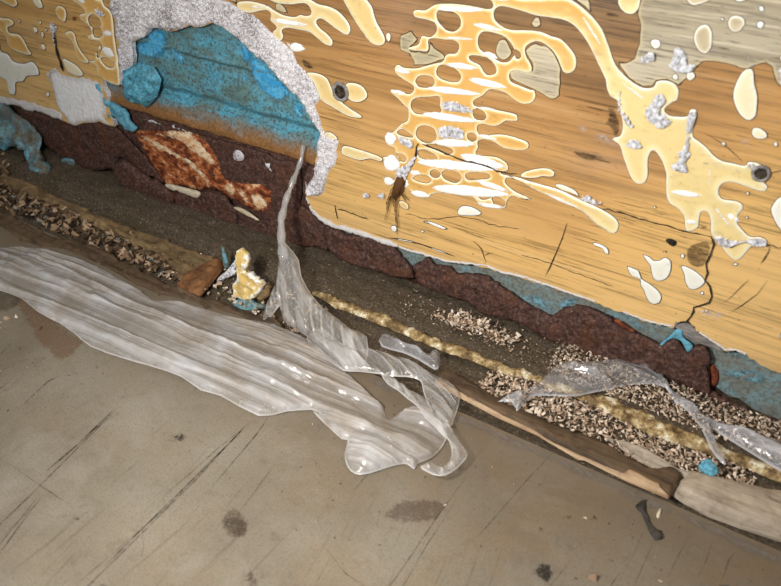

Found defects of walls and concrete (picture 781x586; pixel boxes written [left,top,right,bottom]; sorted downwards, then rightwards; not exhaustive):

peeling [0,103,51,174]
spalling [50,0,339,196]
peeling [400,30,445,65]
peeling [510,43,561,99]
peeling [618,0,781,86]
spalling [217,248,273,312]
corrosion [18,106,753,413]
crack [603,208,767,325]
peeling [395,247,781,419]